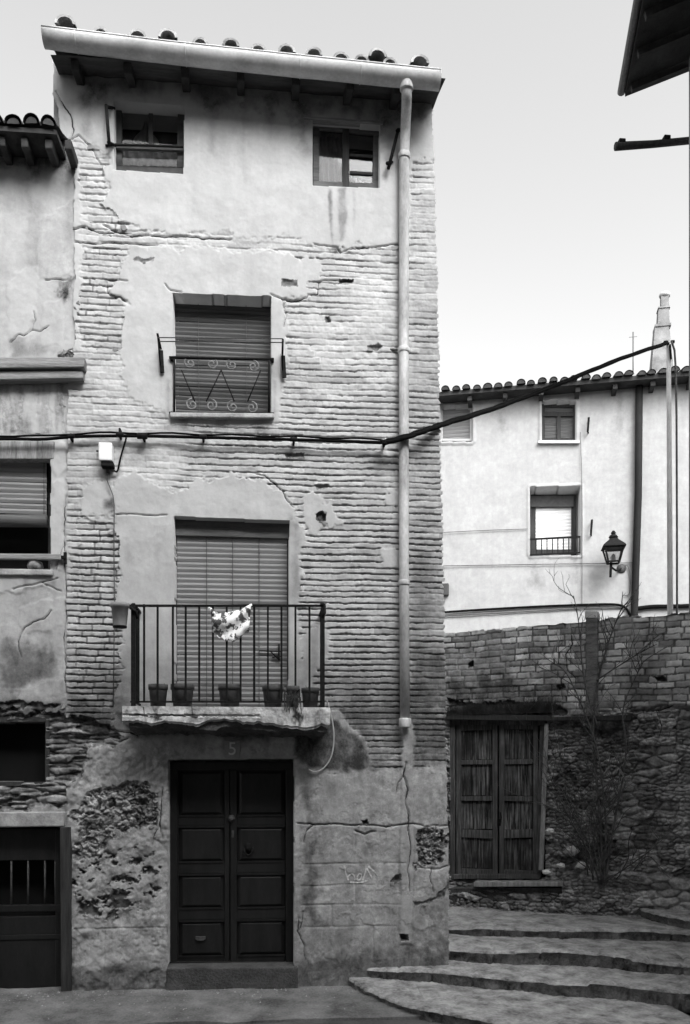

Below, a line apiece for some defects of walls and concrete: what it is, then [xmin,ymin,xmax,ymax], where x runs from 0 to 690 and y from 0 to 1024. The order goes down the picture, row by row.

peeling [57,142,155,357]
spalling [282,278,299,287]
crack [15,499,67,683]
peeling [0,515,166,927]
leakage [292,711,368,771]
crack [297,765,446,890]
flaking render [412,825,449,871]